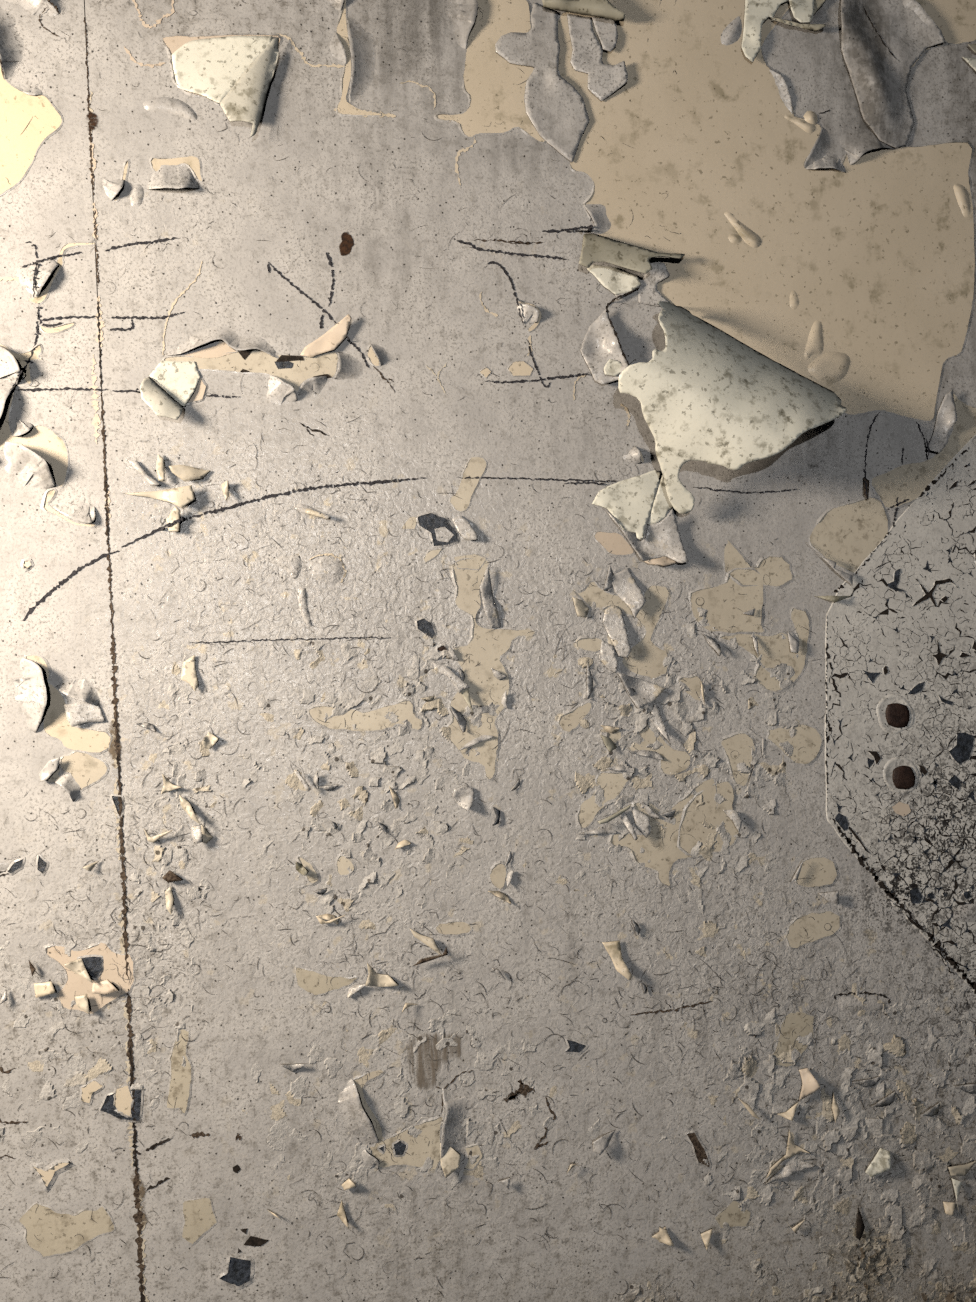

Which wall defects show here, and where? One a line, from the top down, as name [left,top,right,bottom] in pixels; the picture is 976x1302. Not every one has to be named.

peeling [0,0,63,196]
peeling [161,32,283,106]
peeling [0,322,98,528]
peeling [162,314,387,405]
peeling [549,0,976,961]
peeling [13,654,113,802]
peeling [256,456,536,966]
crack [270,437,976,1302]
peeling [0,722,219,1258]
peeling [250,998,567,1228]
peeling [658,946,976,1302]
spalling [216,1228,269,1290]